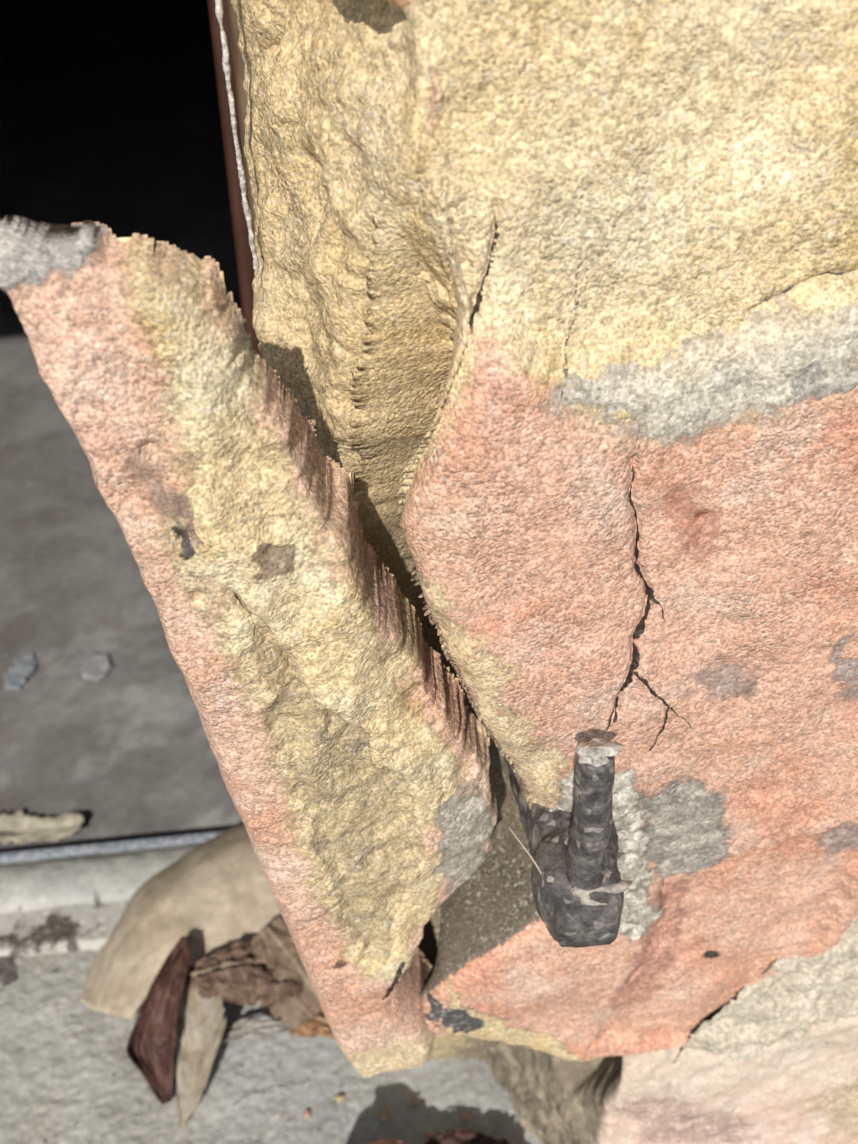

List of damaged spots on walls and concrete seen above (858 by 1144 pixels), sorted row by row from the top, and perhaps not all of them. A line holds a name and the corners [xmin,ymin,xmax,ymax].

crack [604,459,692,751]